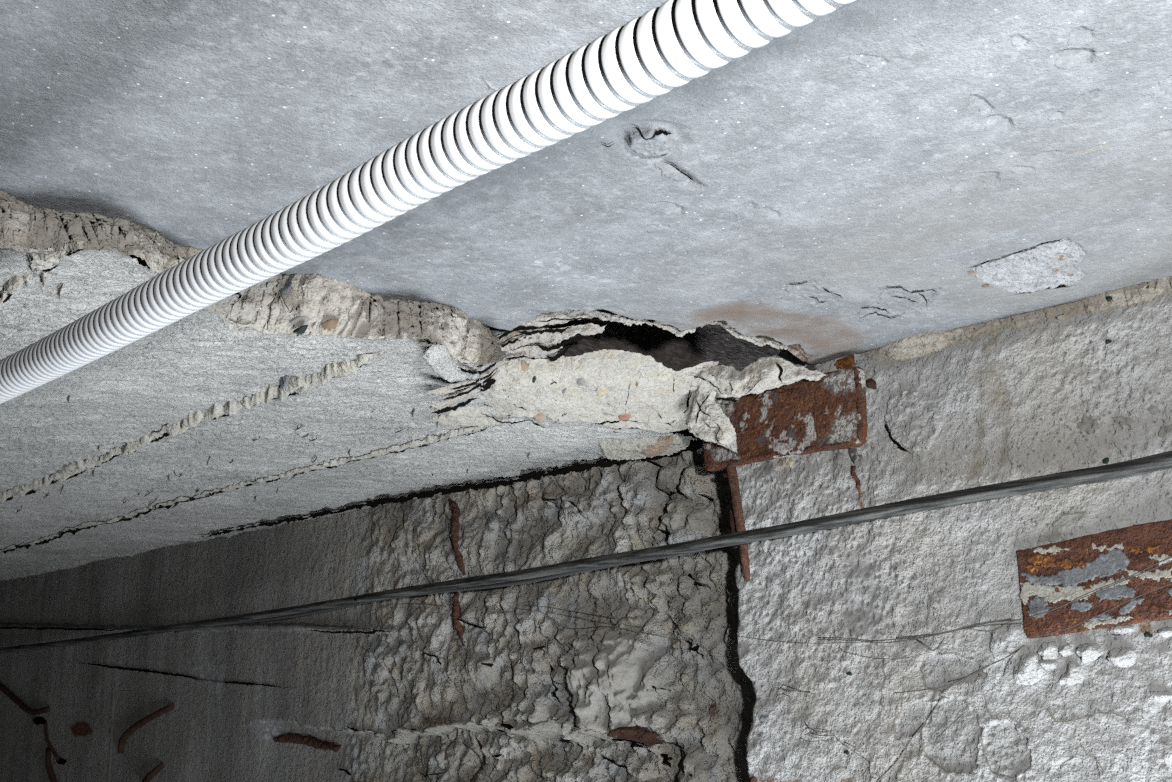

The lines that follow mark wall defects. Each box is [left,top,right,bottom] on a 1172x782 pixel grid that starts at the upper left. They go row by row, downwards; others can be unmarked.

spalling [0,191,203,305]
spalling [968,238,1085,295]
spalling [206,273,719,433]
peeling [723,327,812,364]
crack [202,362,793,537]
crack [0,418,511,554]
rust [1023,553,1092,592]
rust [1127,545,1160,569]
crack [458,619,494,667]
crack [67,662,298,688]
rust [273,732,341,752]
rust [607,725,664,747]